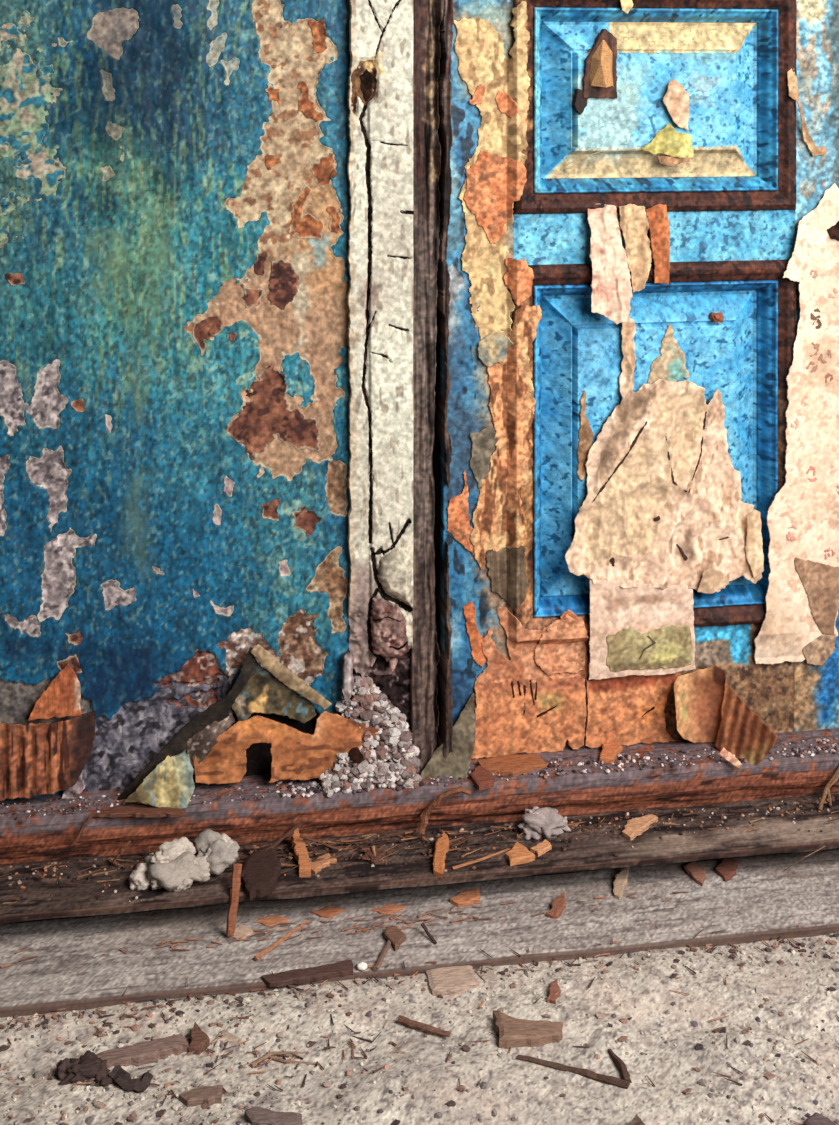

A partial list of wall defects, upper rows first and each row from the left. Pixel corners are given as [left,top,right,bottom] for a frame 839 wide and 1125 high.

peeling [0,10,73,248]
peeling [87,8,139,60]
peeling [0,359,69,436]
peeling [183,0,349,517]
rust [240,251,300,310]
rust [229,365,320,460]
crack [359,104,413,660]
peeling [447,1,542,611]
peeling [577,390,594,481]
peeling [0,446,97,637]
flaking render [0,546,348,792]
flaking render [341,648,411,728]